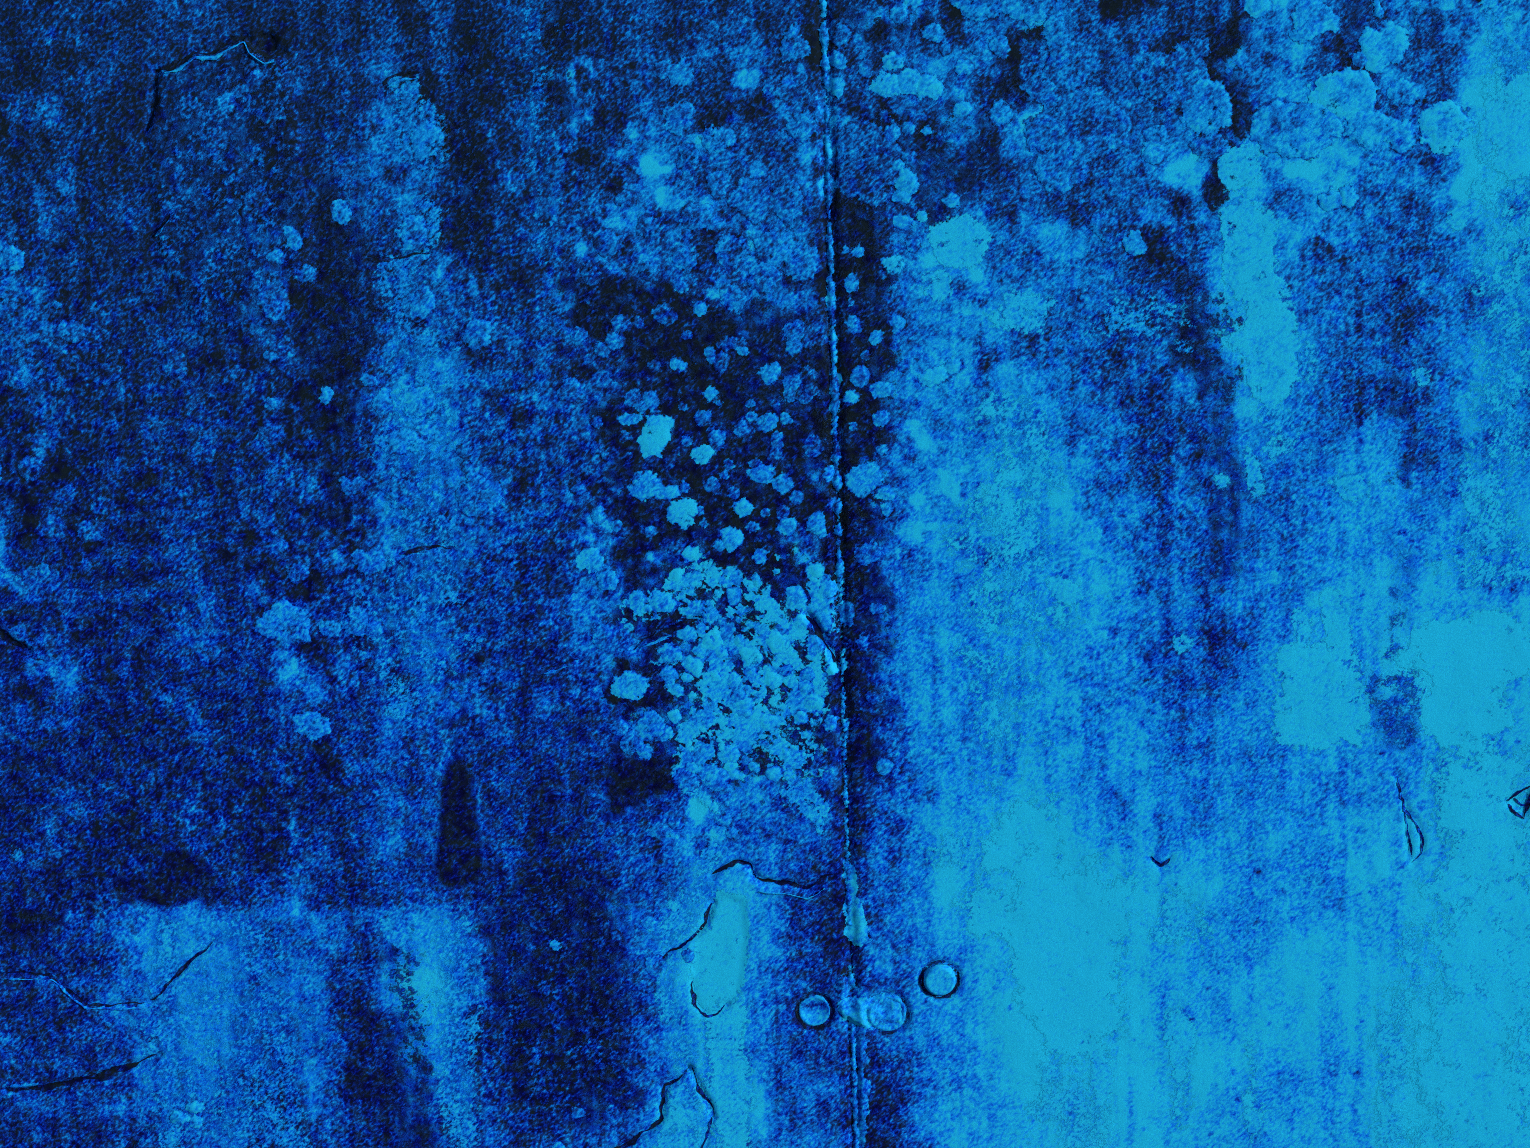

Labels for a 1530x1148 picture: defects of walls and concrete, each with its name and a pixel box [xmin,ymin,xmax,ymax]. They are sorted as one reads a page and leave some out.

water stain [842,0,908,43]
water stain [1005,23,1046,45]
crack [149,35,282,127]
water stain [979,71,1044,111]
water stain [869,100,1002,302]
water stain [985,289,1058,335]
water stain [1084,0,1319,580]
water stain [556,188,904,821]
crack [0,942,213,1010]
spalling [642,836,756,1148]
crack [0,1054,156,1104]
crack [126,1129,145,1148]